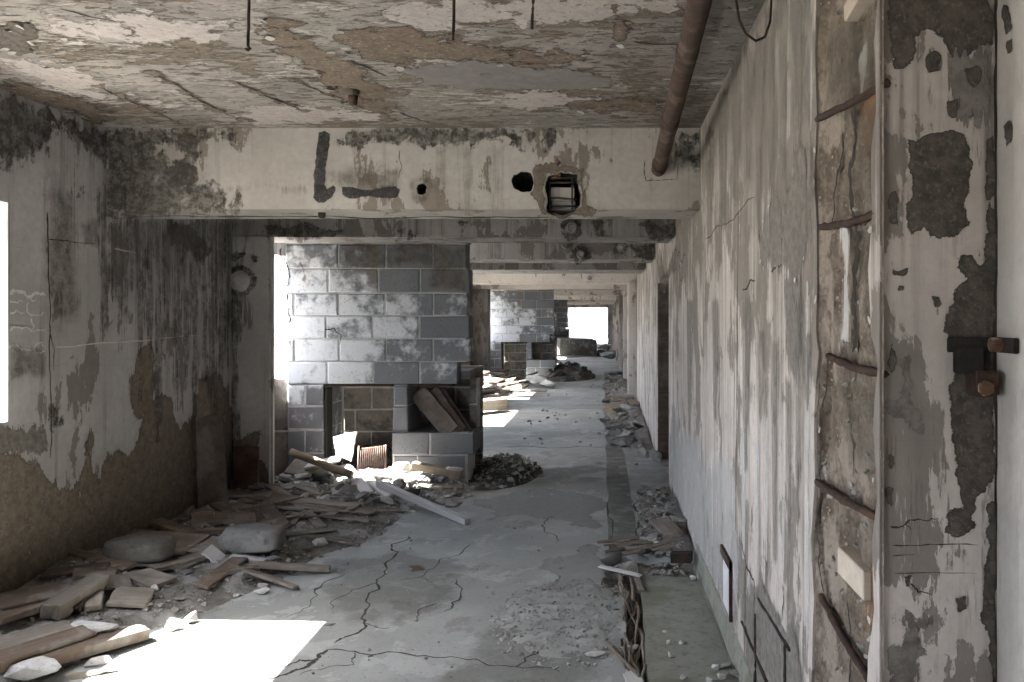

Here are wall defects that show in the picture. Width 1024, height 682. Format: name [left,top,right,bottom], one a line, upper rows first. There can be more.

peeling [0,25,116,124]
peeling [39,0,687,125]
peeling [530,162,597,219]
leakage [0,94,257,476]
peeling [129,338,155,420]
corrosion [825,353,890,379]
spalling [741,0,1013,682]
peeling [0,422,49,455]
peeling [85,427,94,457]
corrosion [814,478,875,520]
crack [266,536,560,679]
corrosion [818,593,868,682]